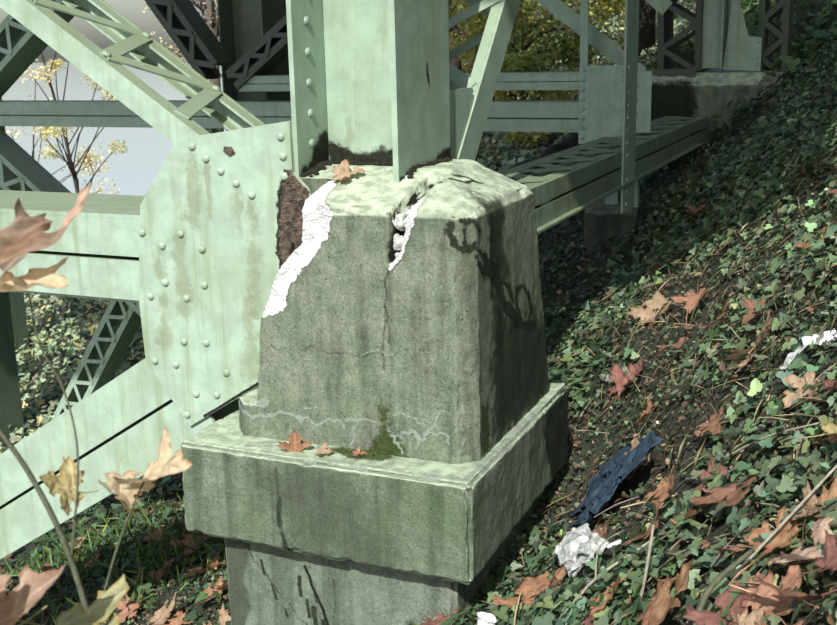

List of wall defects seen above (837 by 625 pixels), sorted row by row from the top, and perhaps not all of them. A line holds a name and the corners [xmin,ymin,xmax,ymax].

corrosion [275,169,309,269]
spalling [263,180,337,317]